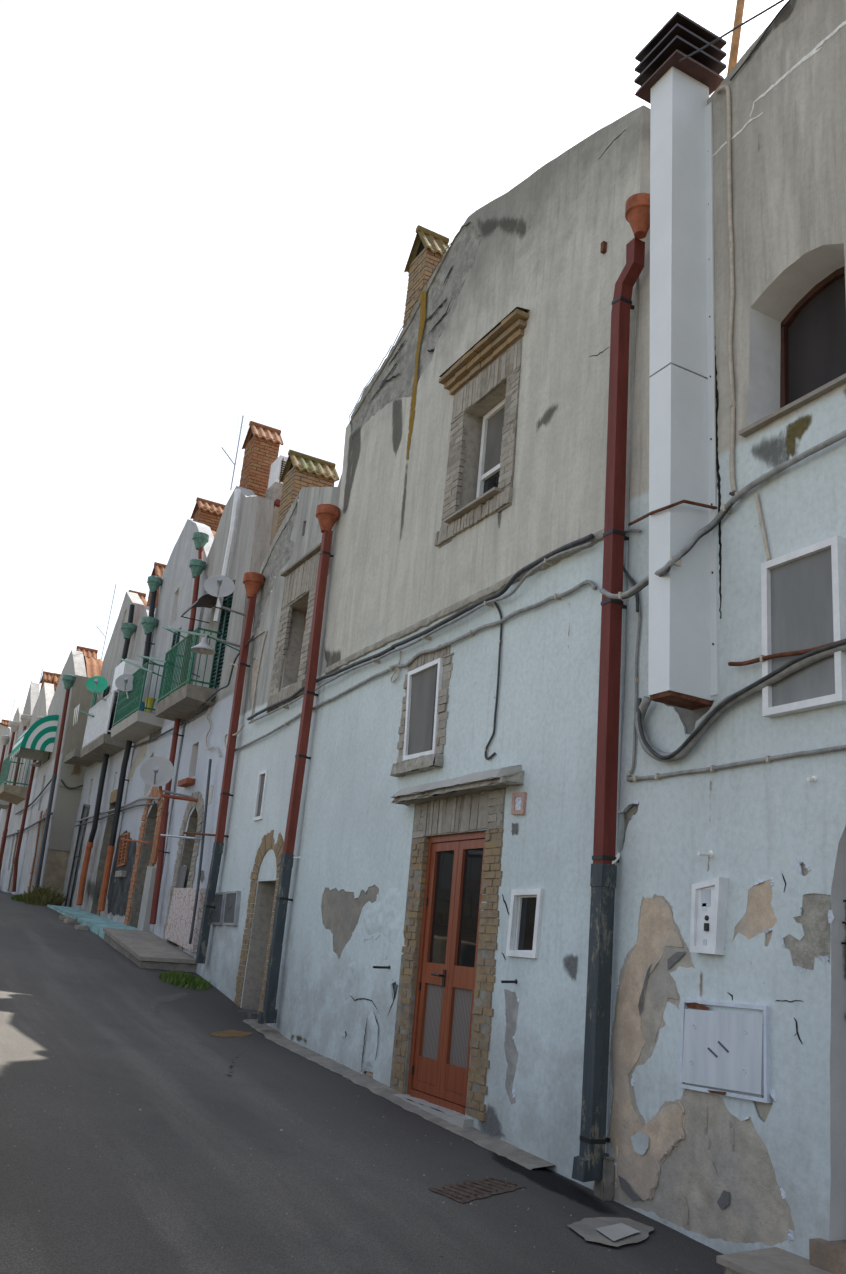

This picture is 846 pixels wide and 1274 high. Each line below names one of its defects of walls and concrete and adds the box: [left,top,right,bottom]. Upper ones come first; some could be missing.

peeling [796,858,811,876]
peeling [321,885,379,959]
peeling [733,877,846,978]
peeling [608,894,795,1246]